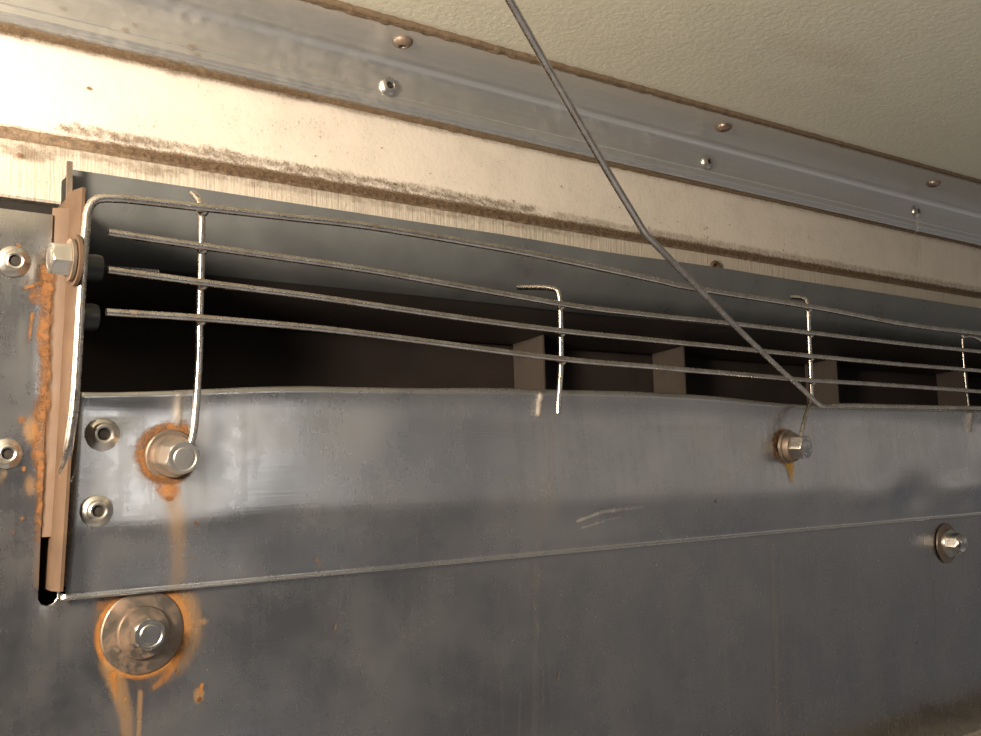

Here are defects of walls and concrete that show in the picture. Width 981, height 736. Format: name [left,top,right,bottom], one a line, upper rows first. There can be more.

leakage [40,122,981,296]
rust [19,265,56,541]
rust [135,422,192,501]
rust [774,428,794,480]
rust [95,591,191,685]